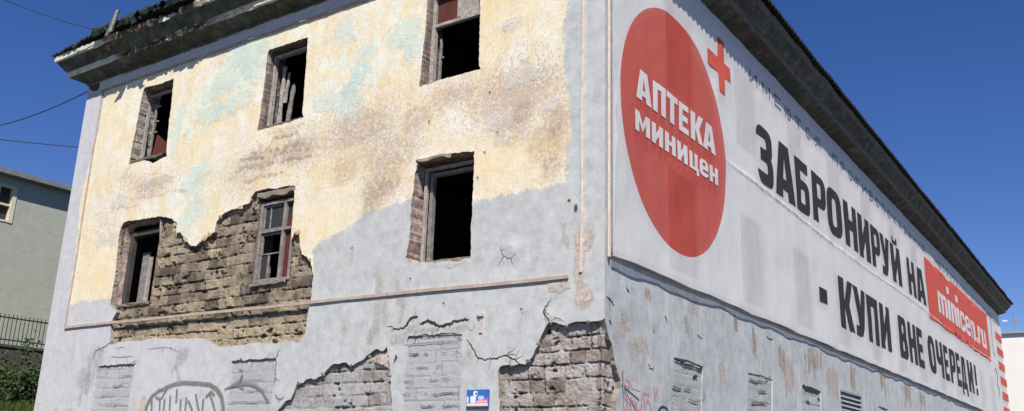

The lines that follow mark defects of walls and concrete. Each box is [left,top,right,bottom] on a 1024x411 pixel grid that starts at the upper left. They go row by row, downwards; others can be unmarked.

spalling [96,157,314,347]
spalling [280,325,429,411]
crack [387,312,520,407]
crack [543,297,563,322]
spalling [501,222,641,411]